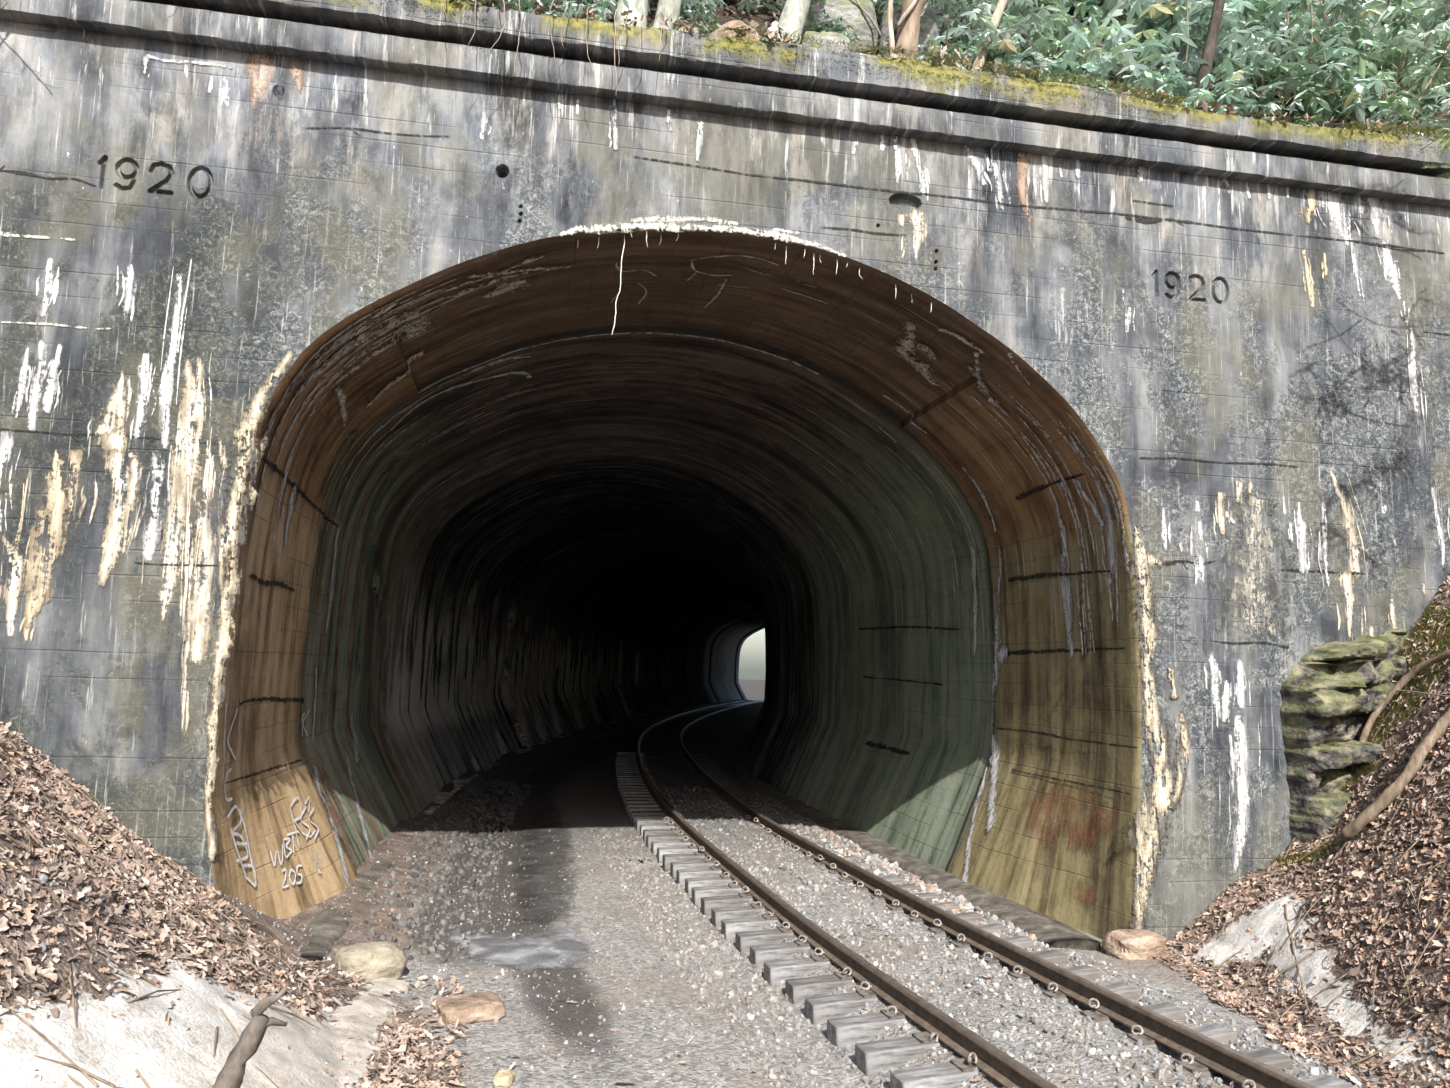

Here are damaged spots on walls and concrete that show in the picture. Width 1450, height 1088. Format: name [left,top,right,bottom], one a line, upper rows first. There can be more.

leakage [143,54,233,107]
leakage [239,68,288,225]
leakage [560,215,846,257]
leakage [1194,176,1450,565]